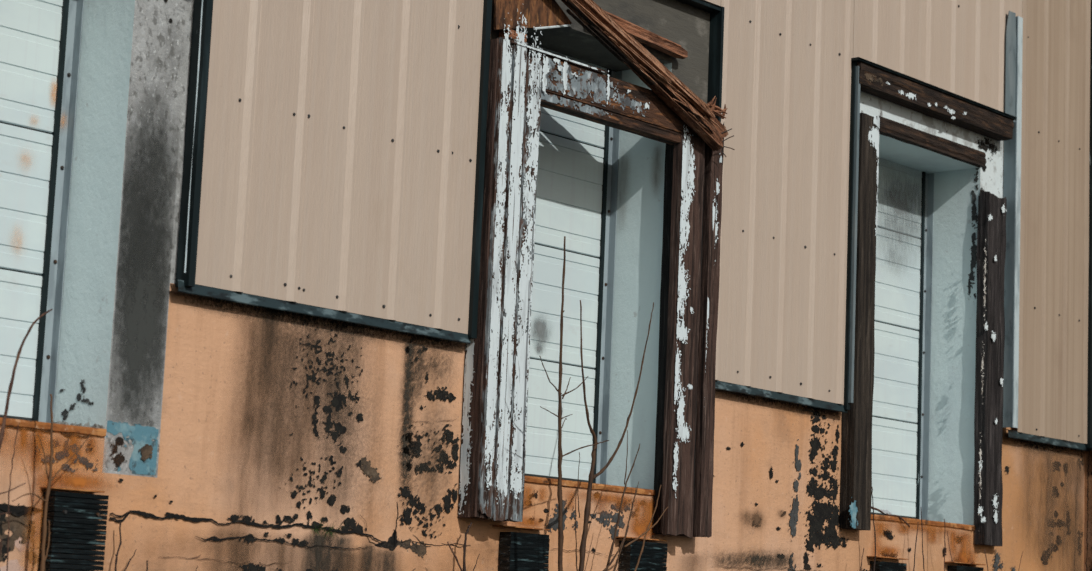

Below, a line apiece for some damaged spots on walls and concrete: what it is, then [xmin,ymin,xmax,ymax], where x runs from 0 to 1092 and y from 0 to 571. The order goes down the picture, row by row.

corrosion [22,430,99,491]
water stain [116,131,169,418]
crack [110,503,469,571]
peeling [228,318,367,547]
water stain [185,296,461,496]
peeling [375,339,475,558]
peeling [484,9,650,543]
corrosion [595,494,654,536]
peeling [672,126,696,498]
peeling [967,137,1007,404]
peeling [978,432,999,523]
water stain [1012,440,1092,571]